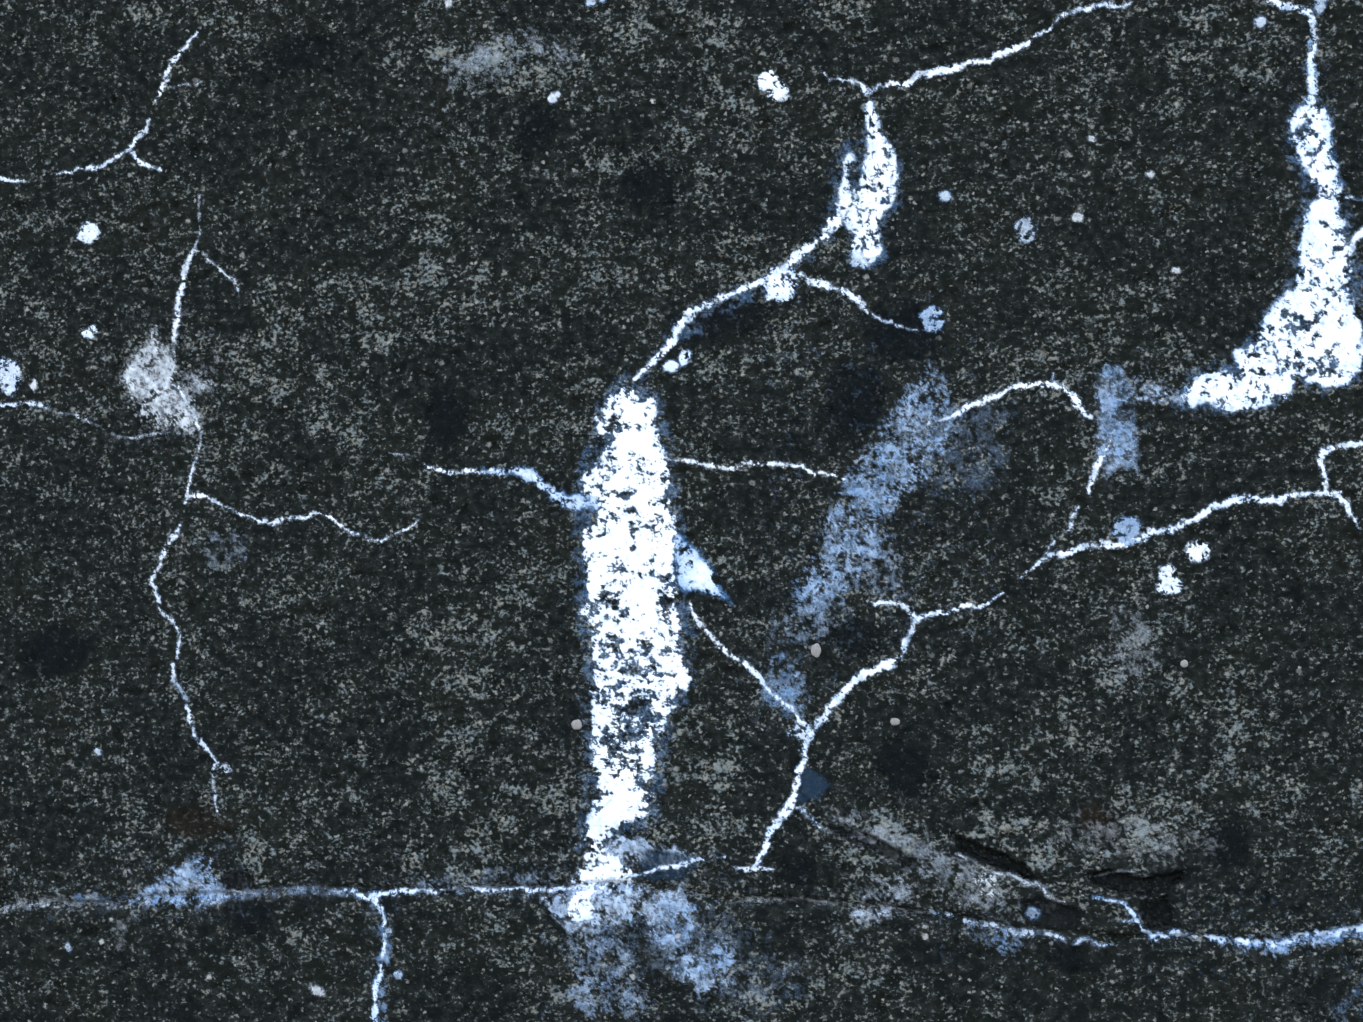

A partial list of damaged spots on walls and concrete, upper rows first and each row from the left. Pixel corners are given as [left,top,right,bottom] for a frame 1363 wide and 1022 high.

crack [0,175,26,183]
crack [0,401,161,439]
crack [59,31,198,174]
crack [172,249,239,352]
crack [150,386,417,812]
leakage [541,388,734,992]
crack [297,381,1363,1022]
crack [633,1,1131,381]
crack [1181,0,1363,412]